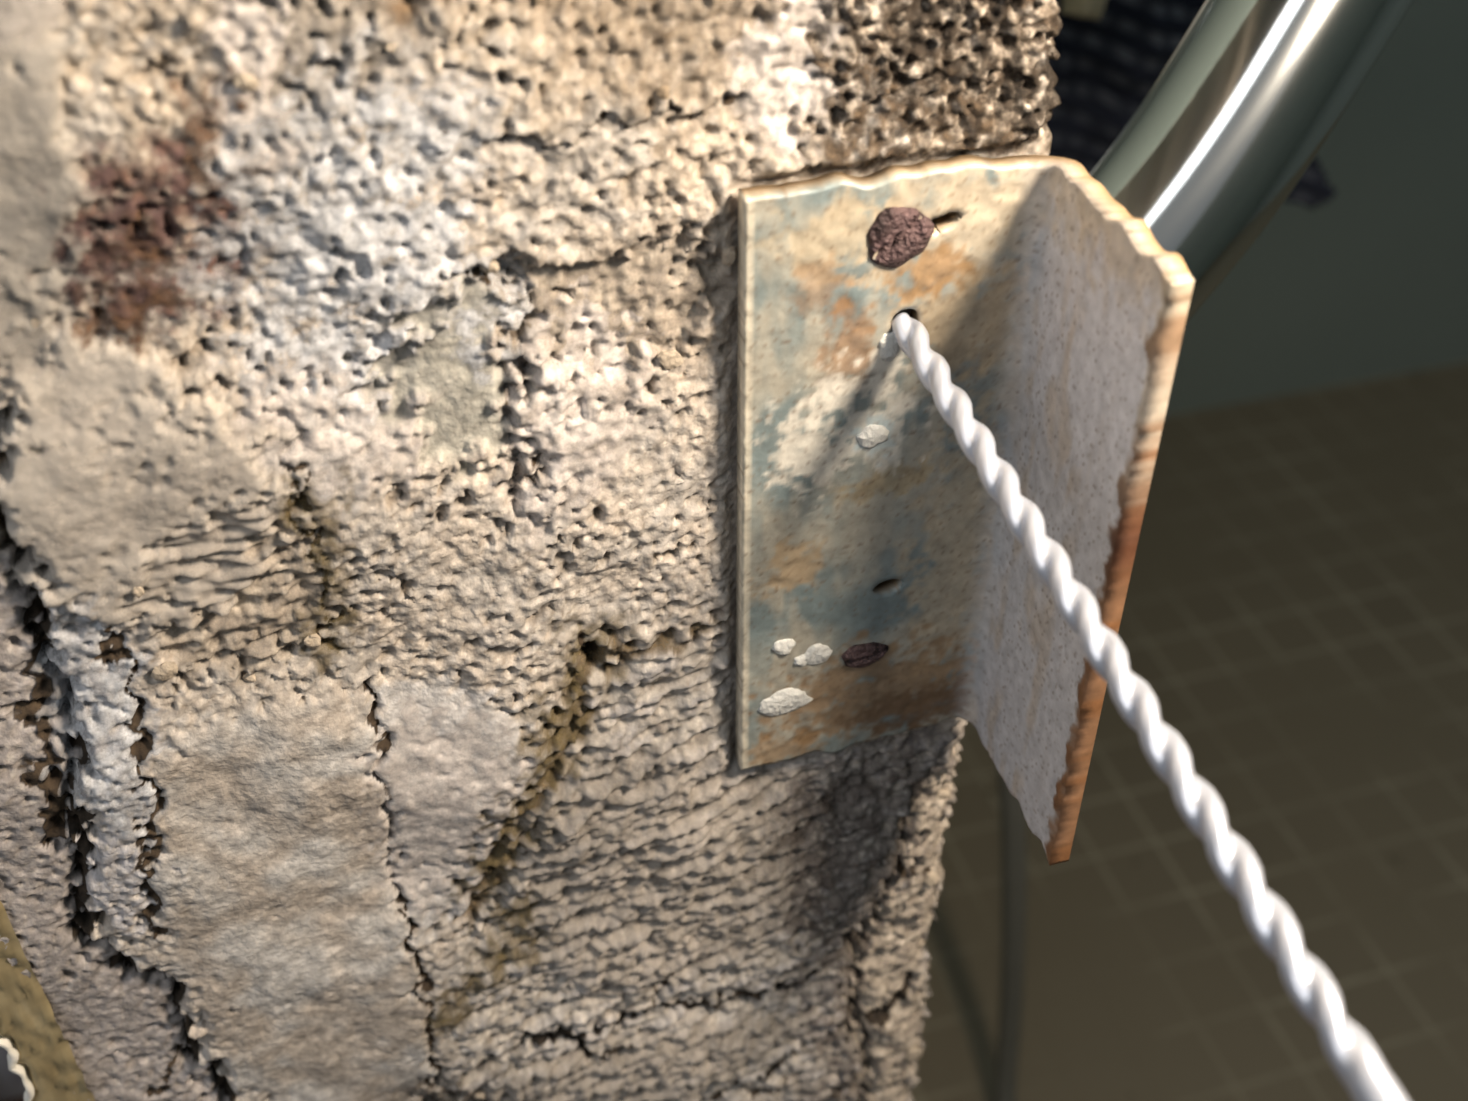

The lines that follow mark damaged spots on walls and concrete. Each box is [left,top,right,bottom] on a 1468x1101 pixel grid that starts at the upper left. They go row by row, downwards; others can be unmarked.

rust [55,67,273,353]
crack [432,0,498,48]
crack [438,91,742,148]
leakage [723,0,1063,173]
crack [0,408,10,467]
spalling [0,288,48,370]
spalling [123,489,334,683]
crack [278,416,345,650]
crack [453,254,541,505]
crack [0,504,237,1101]
crack [363,621,930,1101]